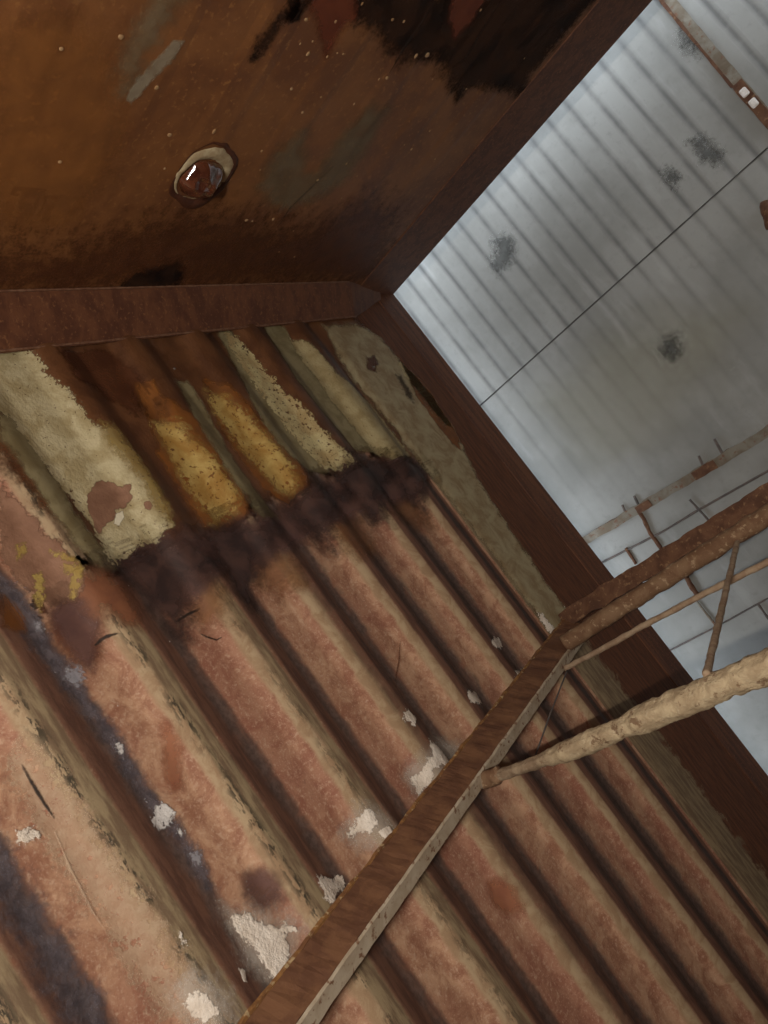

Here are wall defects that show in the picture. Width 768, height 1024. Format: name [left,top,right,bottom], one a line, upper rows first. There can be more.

corrosion [0,24,120,223]
corrosion [169,142,238,209]
leakage [250,0,596,102]
leakage [491,236,515,272]
leakage [690,138,724,164]
peeling [0,350,175,611]
corrosion [0,318,421,667]
leakage [108,455,428,641]
peeling [151,323,565,628]
peeling [7,740,194,1024]
corrosion [237,619,564,1024]